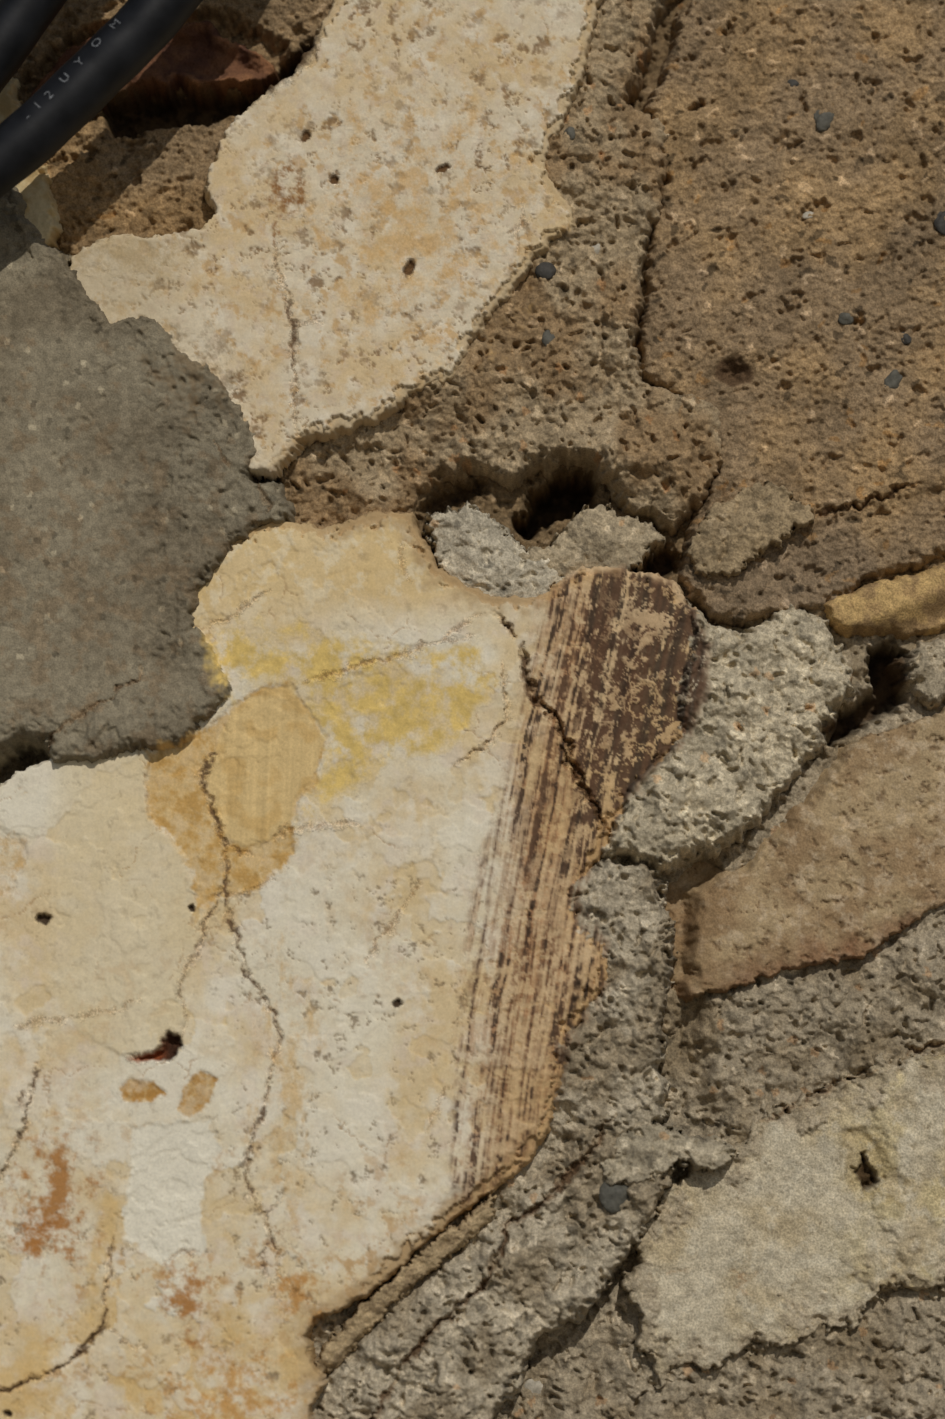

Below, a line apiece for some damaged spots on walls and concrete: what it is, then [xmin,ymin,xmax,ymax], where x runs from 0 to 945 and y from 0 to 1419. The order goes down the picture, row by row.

spalling [99,28,324,139]
hole [418,479,488,517]
hole [512,467,598,540]
hole [636,538,684,579]
crack [48,664,145,758]
peeling [141,677,331,932]
crack [302,613,617,834]
crack [364,878,423,968]
crack [0,752,364,1309]
crack [0,1235,145,1398]
spalling [314,1192,497,1375]
crack [369,1112,618,1419]